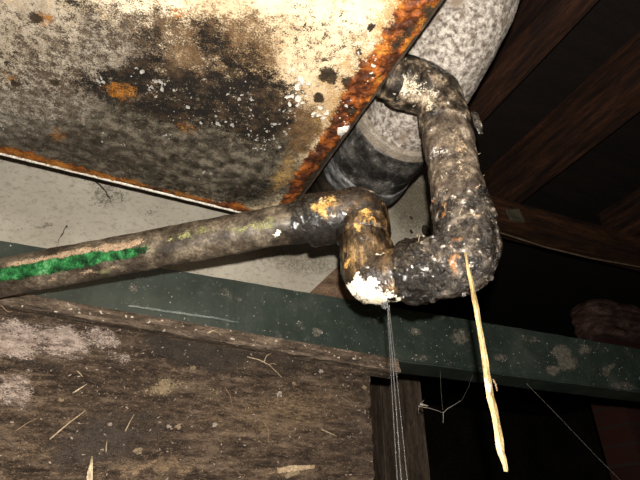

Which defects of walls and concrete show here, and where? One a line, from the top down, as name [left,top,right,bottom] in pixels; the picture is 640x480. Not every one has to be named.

rust [106,82,137,99]
damp [0,0,327,209]
damp [318,58,352,89]
rust [274,0,440,205]
rust [0,146,252,212]
damp [0,402,206,480]